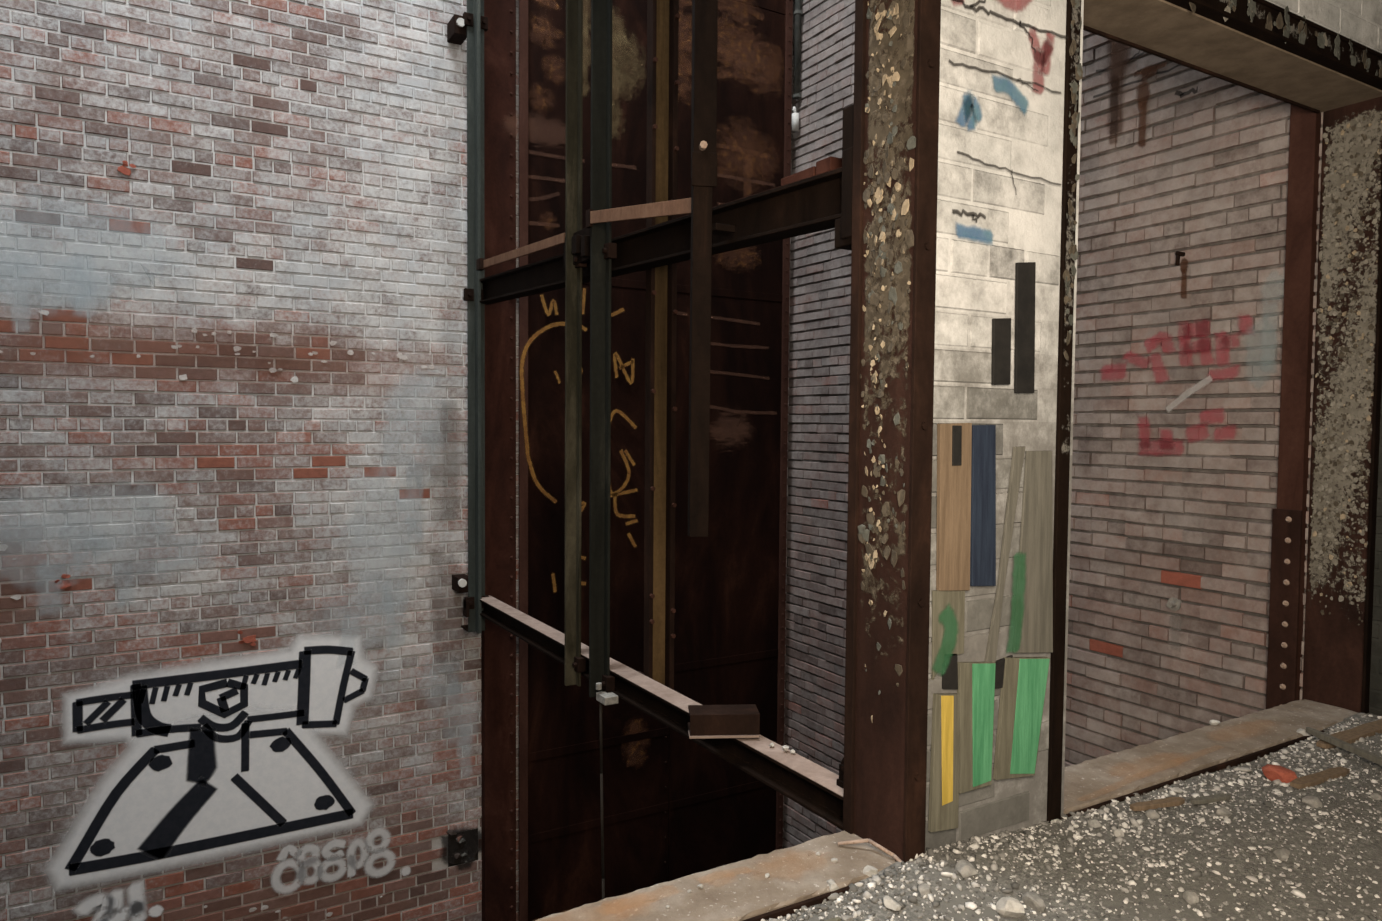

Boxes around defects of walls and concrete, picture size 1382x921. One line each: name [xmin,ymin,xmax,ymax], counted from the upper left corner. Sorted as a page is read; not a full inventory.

crack [949,0,1198,98]